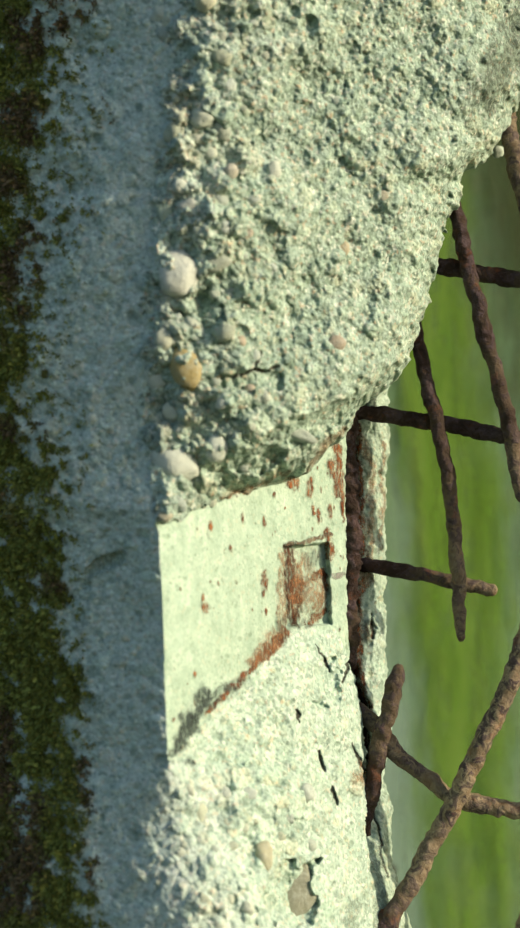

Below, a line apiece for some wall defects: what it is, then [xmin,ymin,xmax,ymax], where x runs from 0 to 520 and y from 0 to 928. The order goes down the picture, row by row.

water stain [402,349,427,414]
corrosion [205,426,346,713]
spalling [136,0,520,928]
corrosion [355,571,373,709]
corrosion [355,423,386,559]
water stain [401,426,448,572]
water stain [462,436,513,691]
corrosion [353,727,370,785]
water stain [392,703,406,751]
water stain [374,758,416,927]